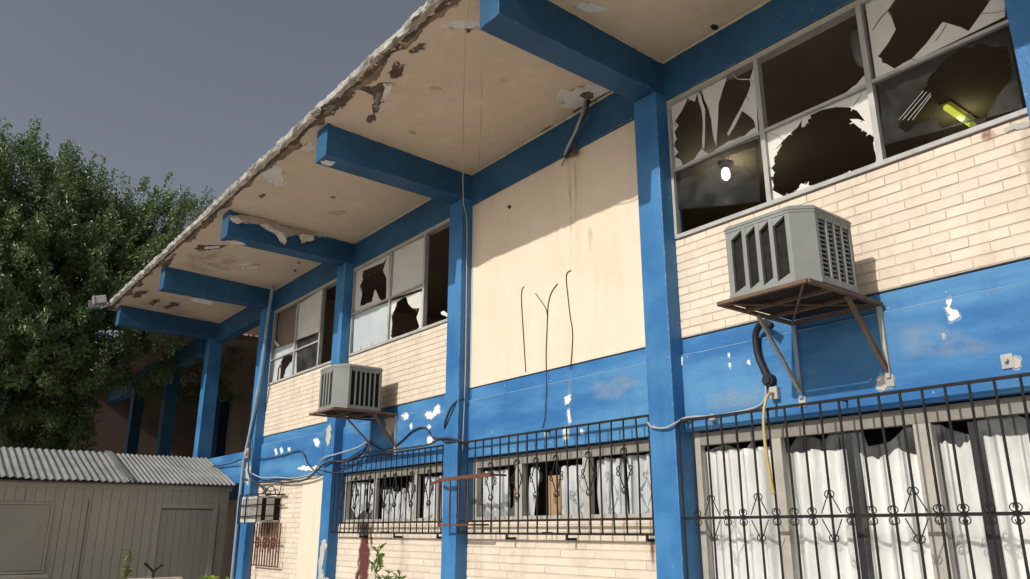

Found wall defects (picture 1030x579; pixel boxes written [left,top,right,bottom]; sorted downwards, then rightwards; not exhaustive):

peeling [556,84,610,109]
spalling [110,0,479,310]
spalling [938,295,962,340]
spalling [870,373,895,392]
spalling [1012,355,1023,371]
peeling [384,412,413,437]
spalling [424,404,442,456]
spalling [562,392,585,442]
rust [355,524,372,579]